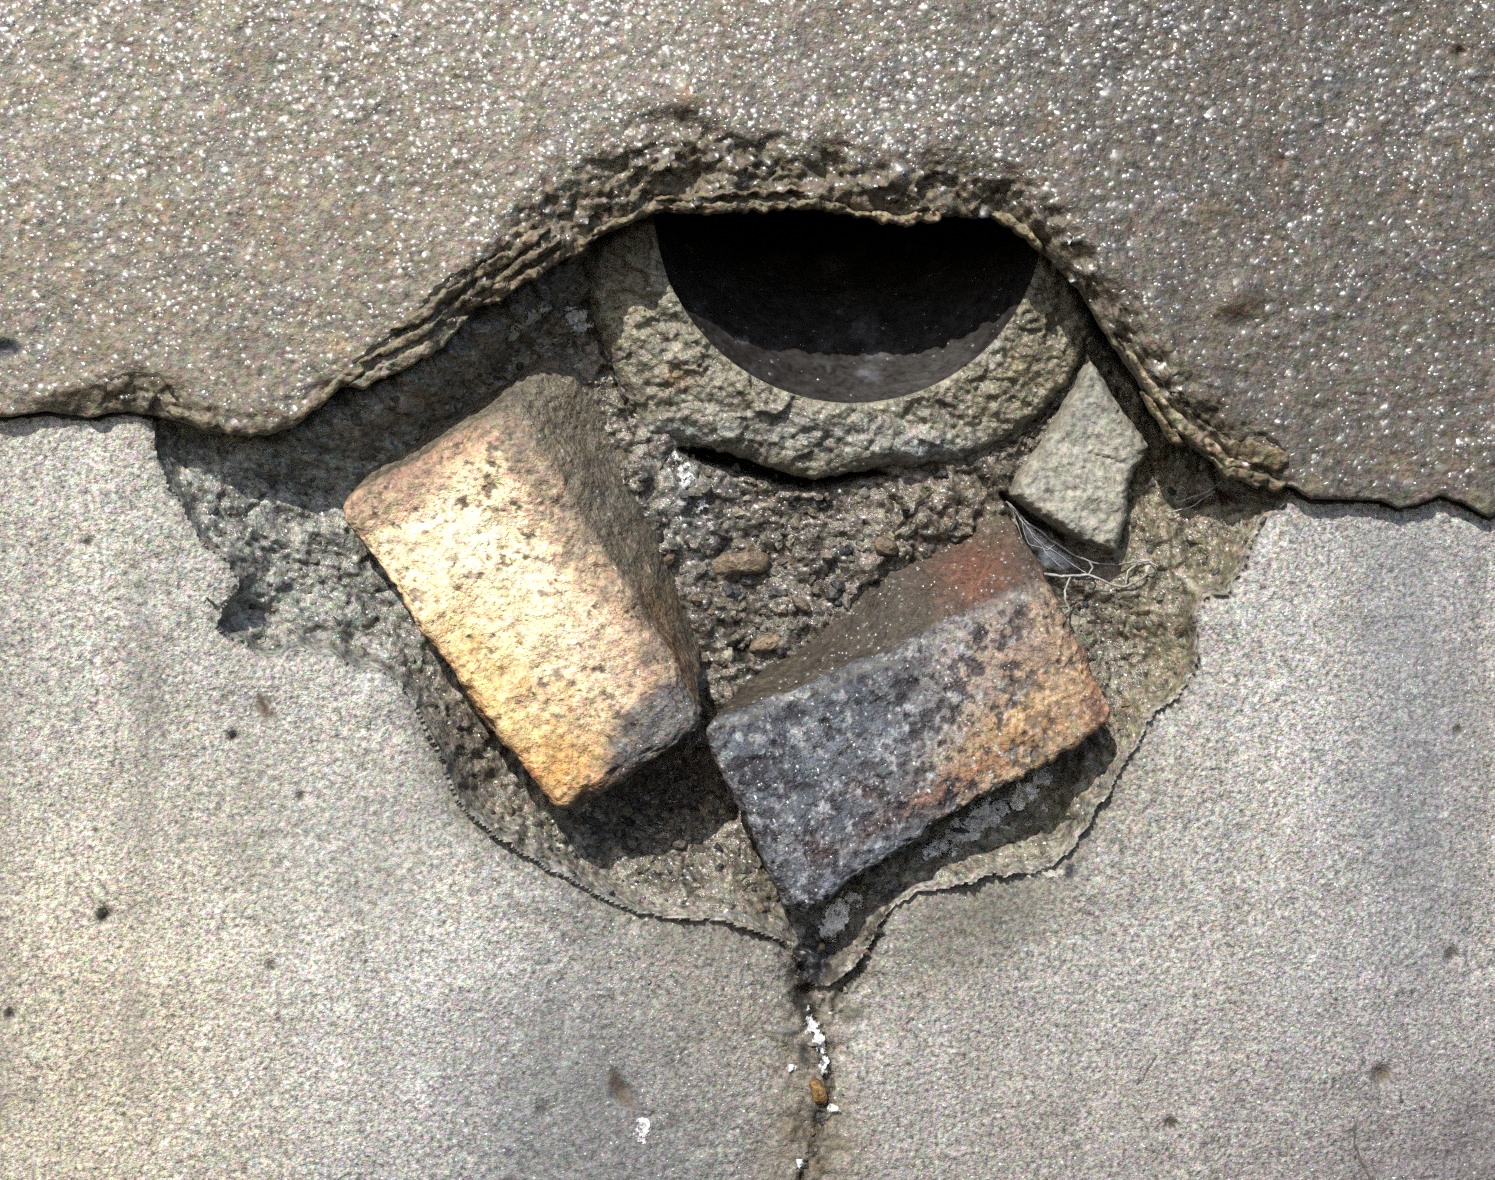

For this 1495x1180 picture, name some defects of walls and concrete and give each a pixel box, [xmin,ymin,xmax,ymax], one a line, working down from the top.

spalling [152,184,1297,988]
efflorescence [917,767,1053,861]
crack [753,904,891,1180]